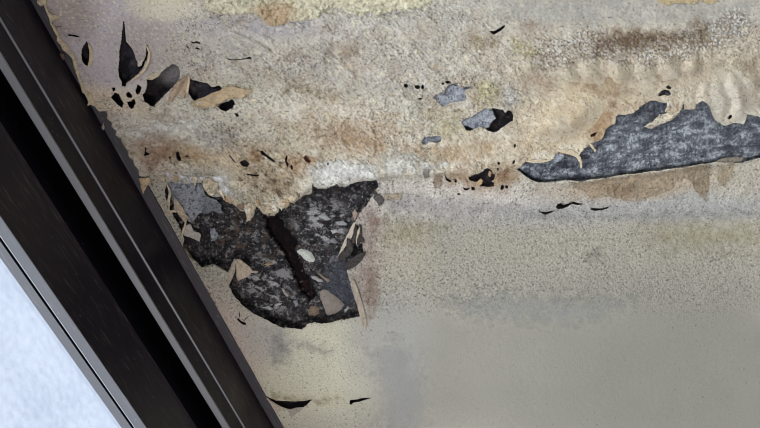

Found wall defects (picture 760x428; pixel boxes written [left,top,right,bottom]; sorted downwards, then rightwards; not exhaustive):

peeling [130,46,160,82]
peeling [434,81,472,107]
peeling [461,108,513,133]
spalling [512,85,760,201]
peeling [423,162,508,195]
spalling [164,176,403,330]